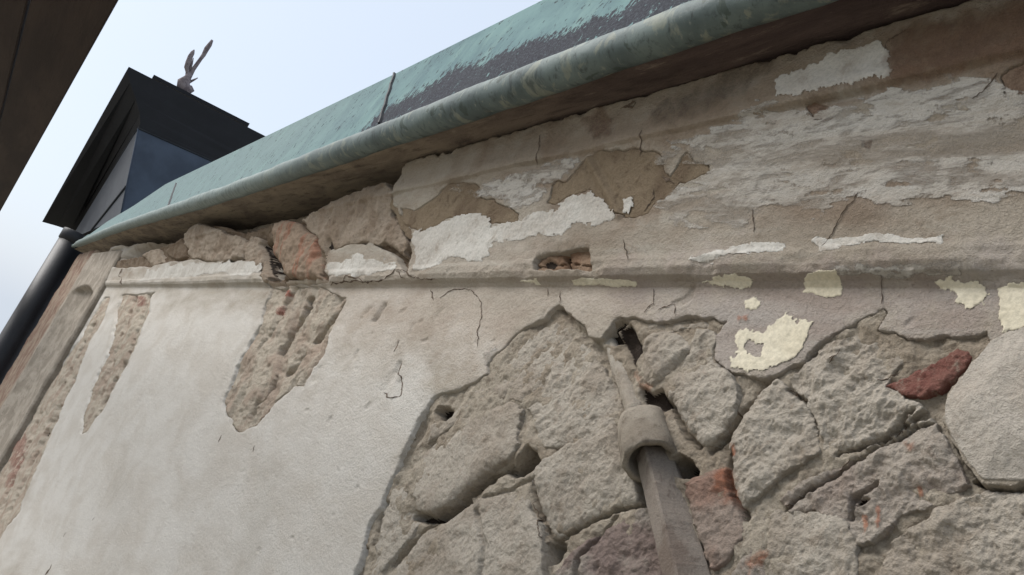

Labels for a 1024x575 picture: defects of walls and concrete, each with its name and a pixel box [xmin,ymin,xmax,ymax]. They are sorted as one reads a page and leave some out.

flaking render [0,294,152,538]
crack [385,344,403,398]
crack [331,269,482,346]
peeling [116,40,1024,432]
flaking render [358,309,1024,575]
crack [824,192,858,244]